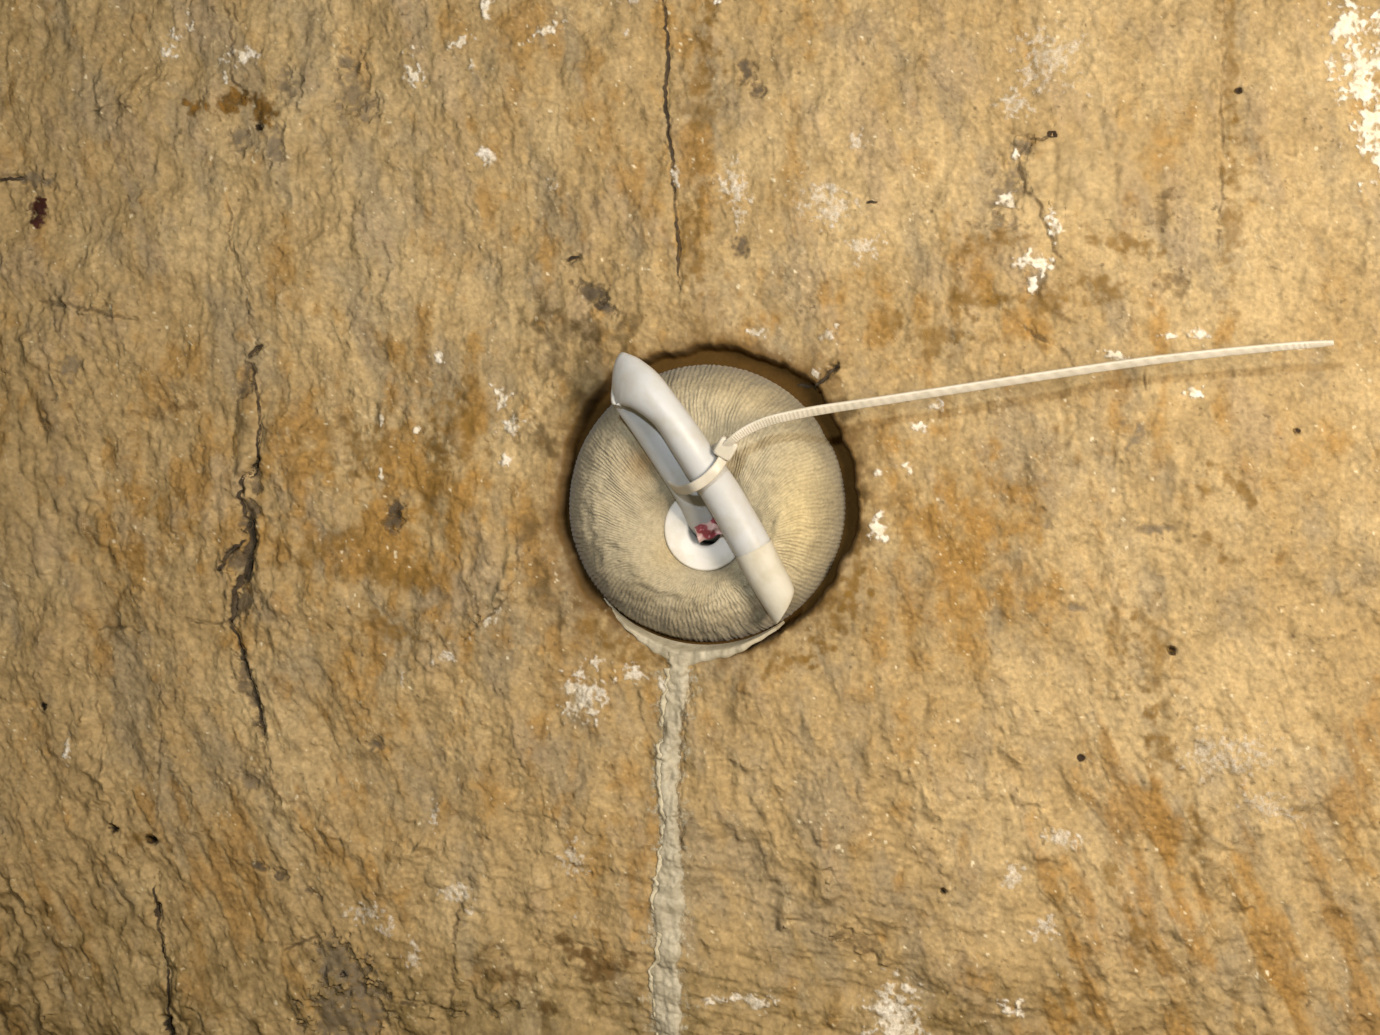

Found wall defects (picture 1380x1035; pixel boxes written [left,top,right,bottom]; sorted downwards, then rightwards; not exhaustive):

crack [662,0,682,276]
damp [1324,0,1380,186]
crack [217,344,266,735]
crack [153,887,174,1035]
damp [561,652,776,1035]